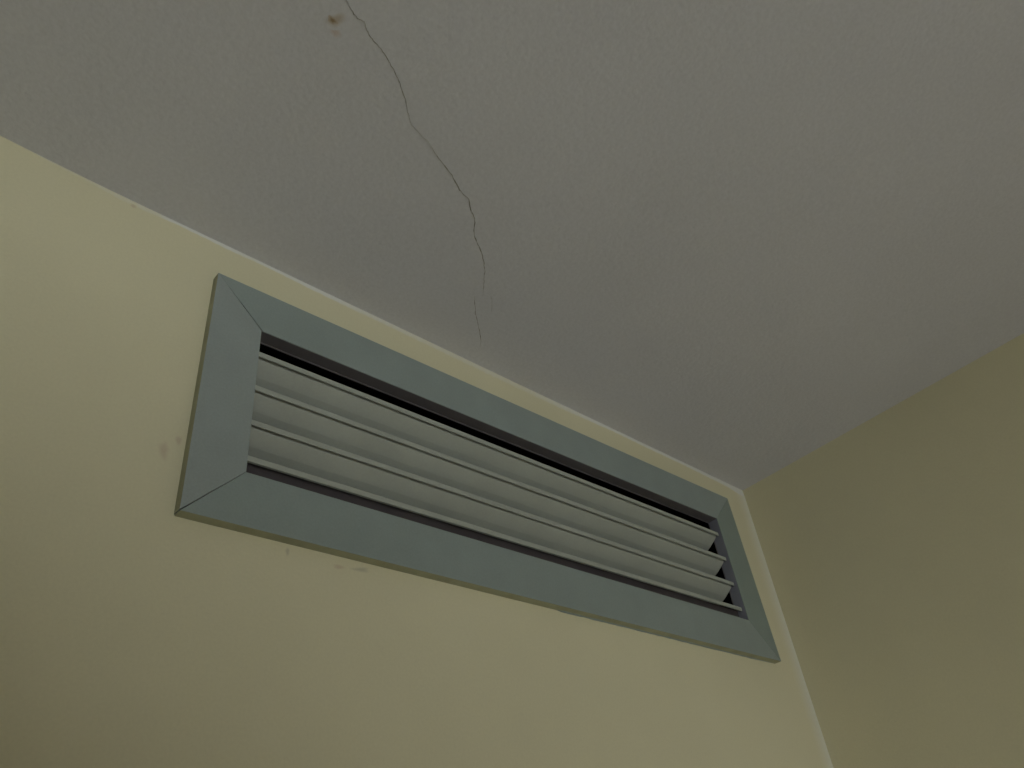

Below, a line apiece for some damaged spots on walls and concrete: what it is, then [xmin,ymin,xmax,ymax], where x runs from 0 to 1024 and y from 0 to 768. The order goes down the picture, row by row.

crack [349,6,492,346]